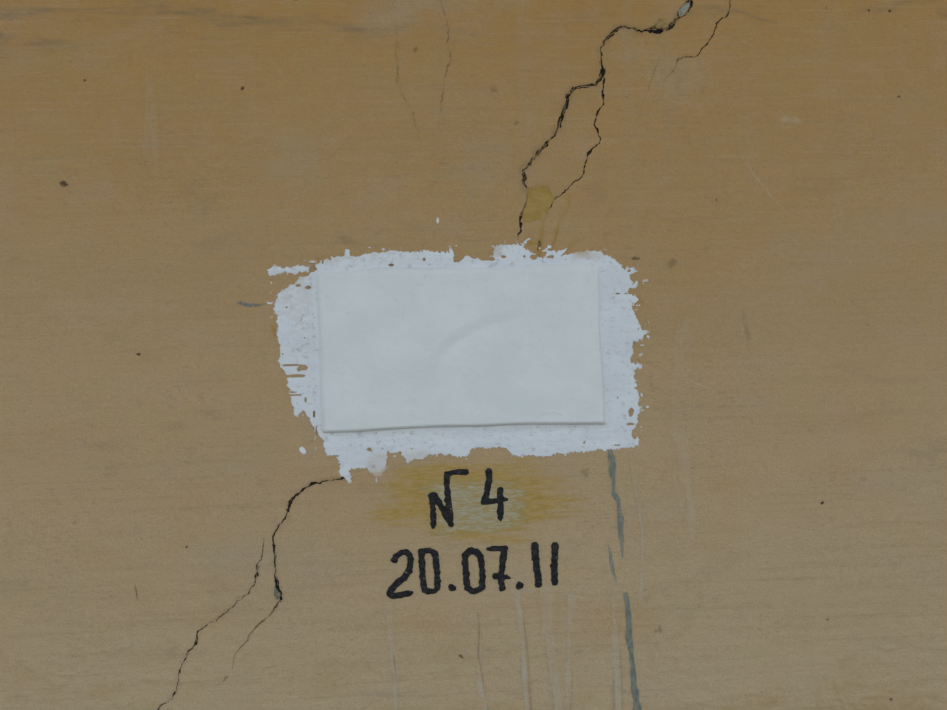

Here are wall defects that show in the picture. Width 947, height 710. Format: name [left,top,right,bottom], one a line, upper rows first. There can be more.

crack [517,0,731,236]
crack [154,475,348,710]